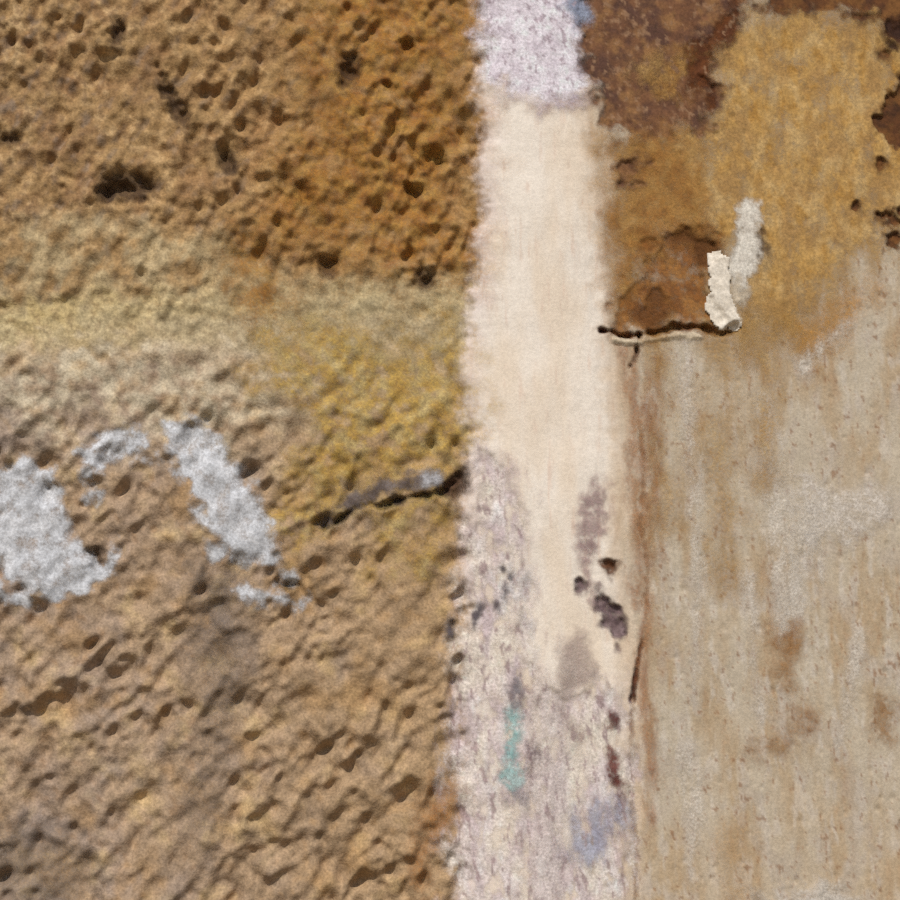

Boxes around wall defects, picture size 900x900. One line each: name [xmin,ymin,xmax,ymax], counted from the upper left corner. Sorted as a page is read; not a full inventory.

spalling [471,0,900,341]
damp [607,6,900,373]
crack [598,322,739,366]
crack [319,467,469,530]
damp [758,402,802,623]
spalling [88,547,102,566]
peeling [207,543,226,562]
peeling [281,571,297,590]